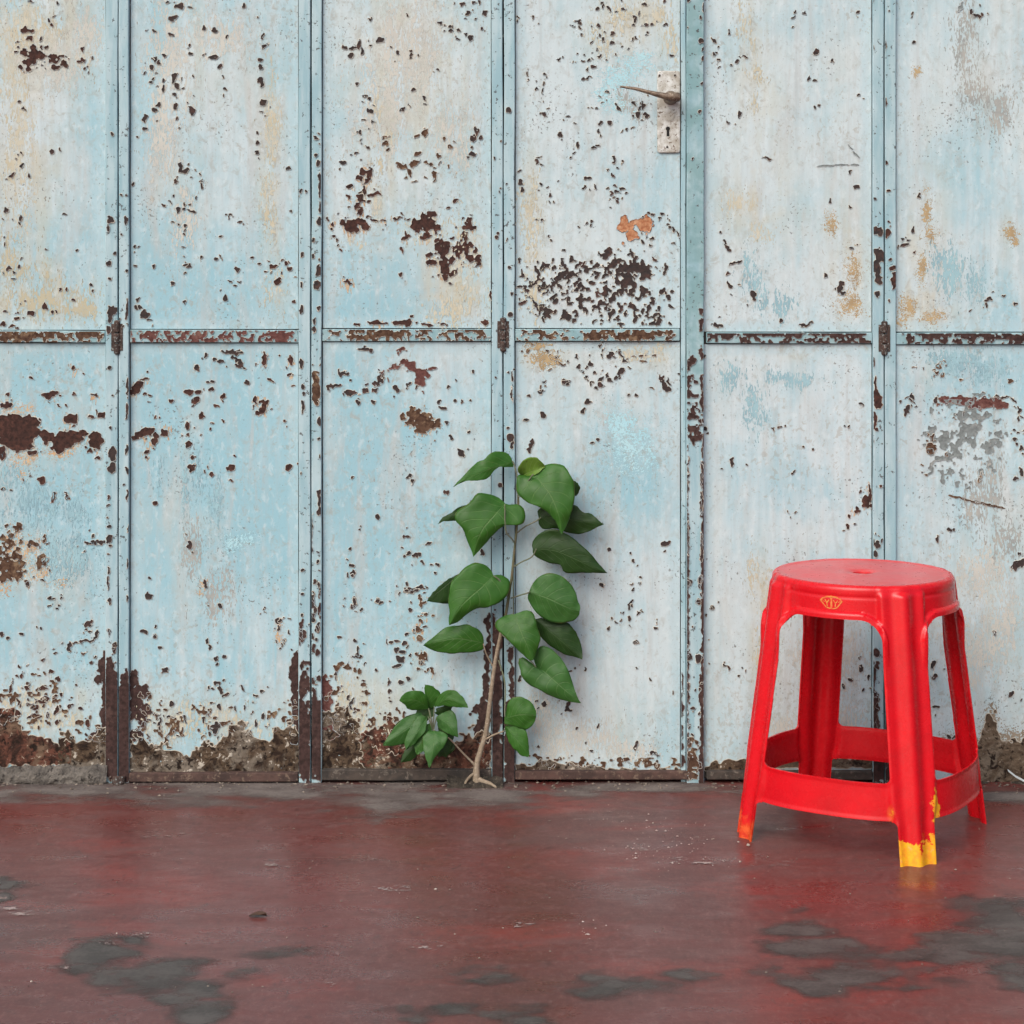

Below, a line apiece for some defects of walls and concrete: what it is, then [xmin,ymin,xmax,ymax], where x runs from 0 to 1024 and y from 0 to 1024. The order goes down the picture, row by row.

peeling [911,359,947,378]
corrosion [0,83,1024,783]
peeling [899,378,1024,489]